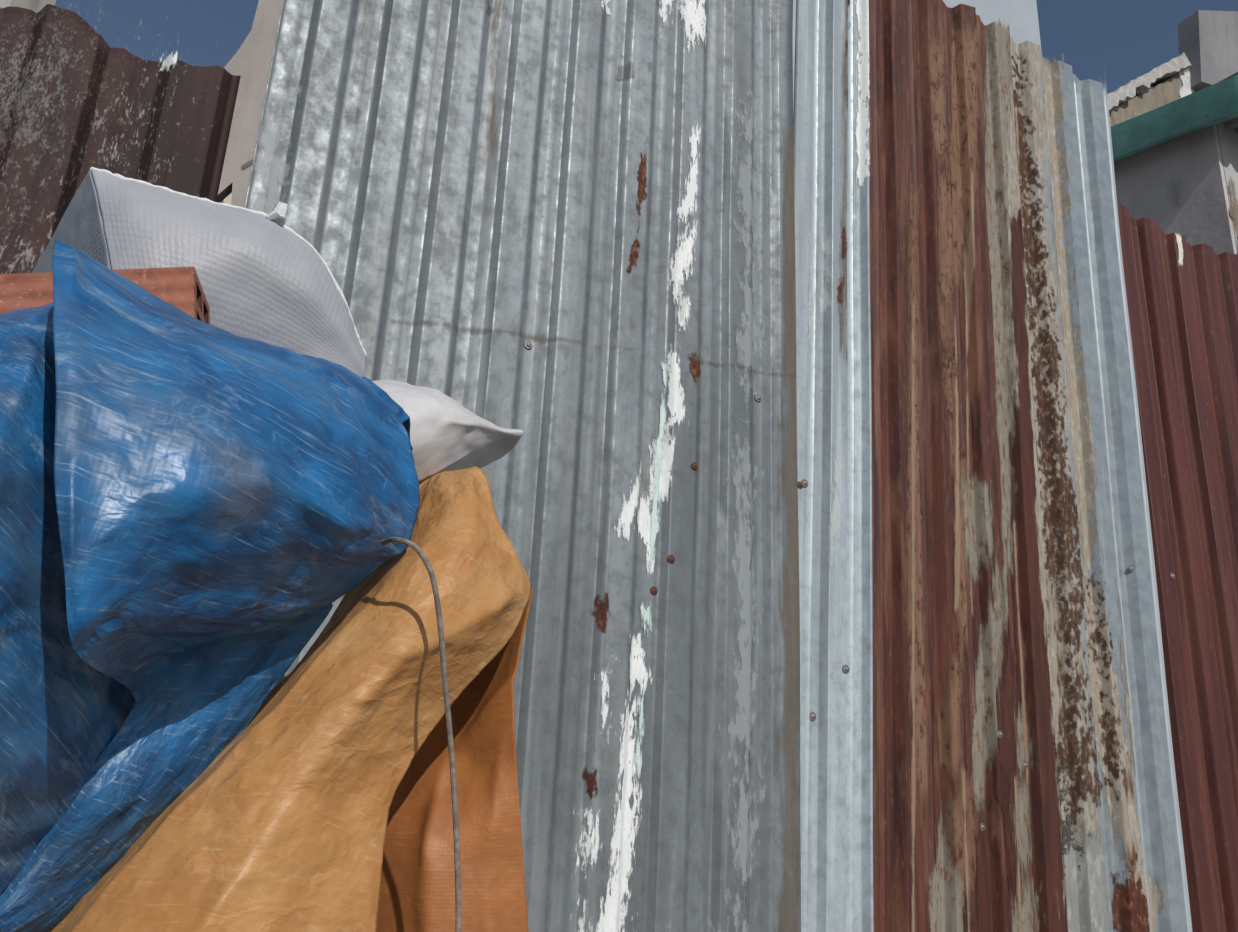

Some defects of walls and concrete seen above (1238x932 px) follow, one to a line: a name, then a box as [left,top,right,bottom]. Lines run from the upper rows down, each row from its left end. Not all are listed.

corrosion [627,153,647,272]
corrosion [689,352,701,382]
corrosion [963,41,1133,932]
corrosion [593,592,610,633]
corrosion [583,767,598,798]
corrosion [1110,847,1150,932]